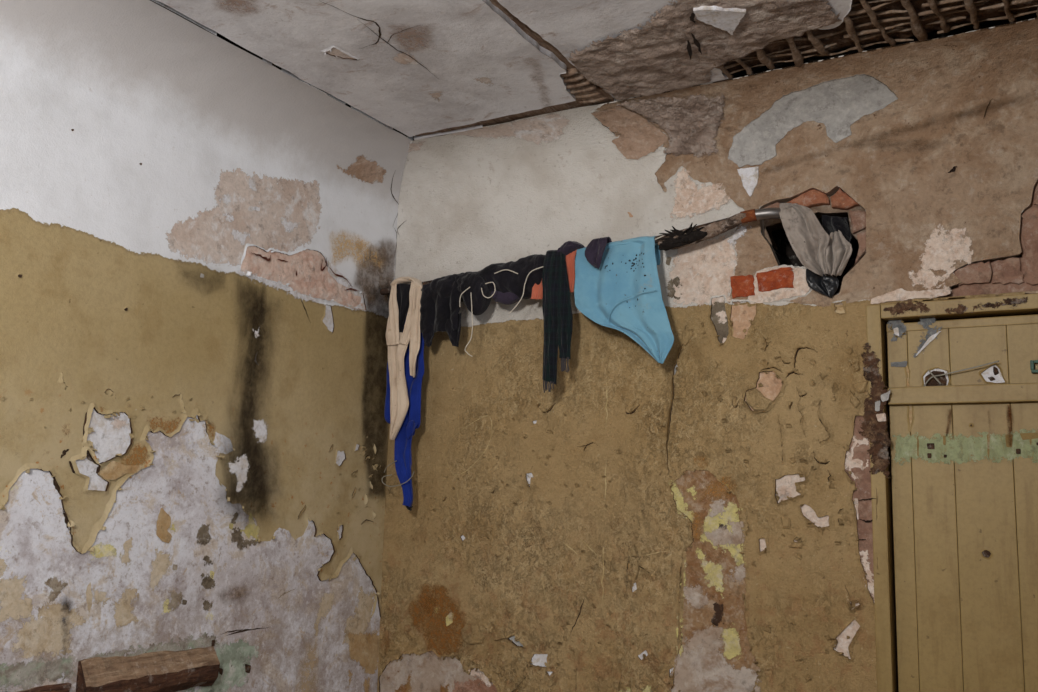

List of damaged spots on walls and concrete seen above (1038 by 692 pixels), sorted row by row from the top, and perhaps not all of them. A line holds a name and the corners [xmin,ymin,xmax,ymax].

crack [325,3,435,76]
peeling [165,168,367,335]
flaking render [567,0,1038,387]
peeling [0,395,501,692]
peeling [505,619,585,680]
peeling [665,451,771,692]
peeling [733,356,789,415]
crack [759,338,876,540]
peeling [773,391,1038,662]